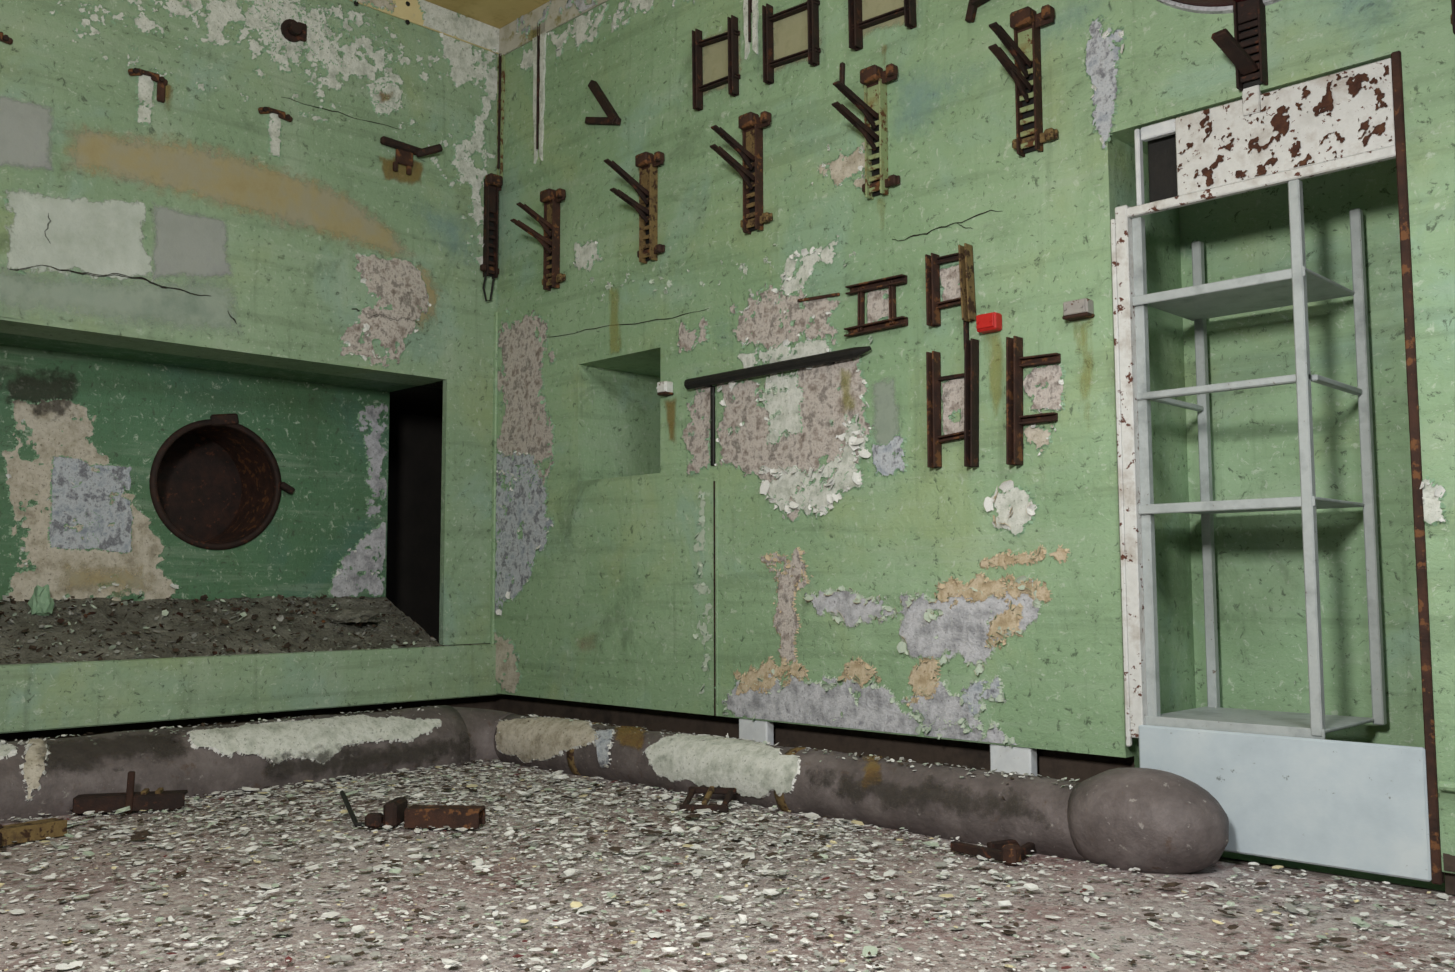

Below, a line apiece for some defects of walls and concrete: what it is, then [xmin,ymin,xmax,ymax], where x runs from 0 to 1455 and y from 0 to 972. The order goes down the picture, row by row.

peeling [703,31,741,93]
peeling [773,10,808,71]
peeling [862,0,904,35]
peeling [1083,15,1127,152]
peeling [811,142,865,190]
spalling [338,253,431,369]
peeling [1,398,179,603]
peeling [325,397,389,598]
peeling [492,306,556,694]
peeling [682,233,1071,749]
peeling [0,738,50,802]
peeling [642,733,801,798]